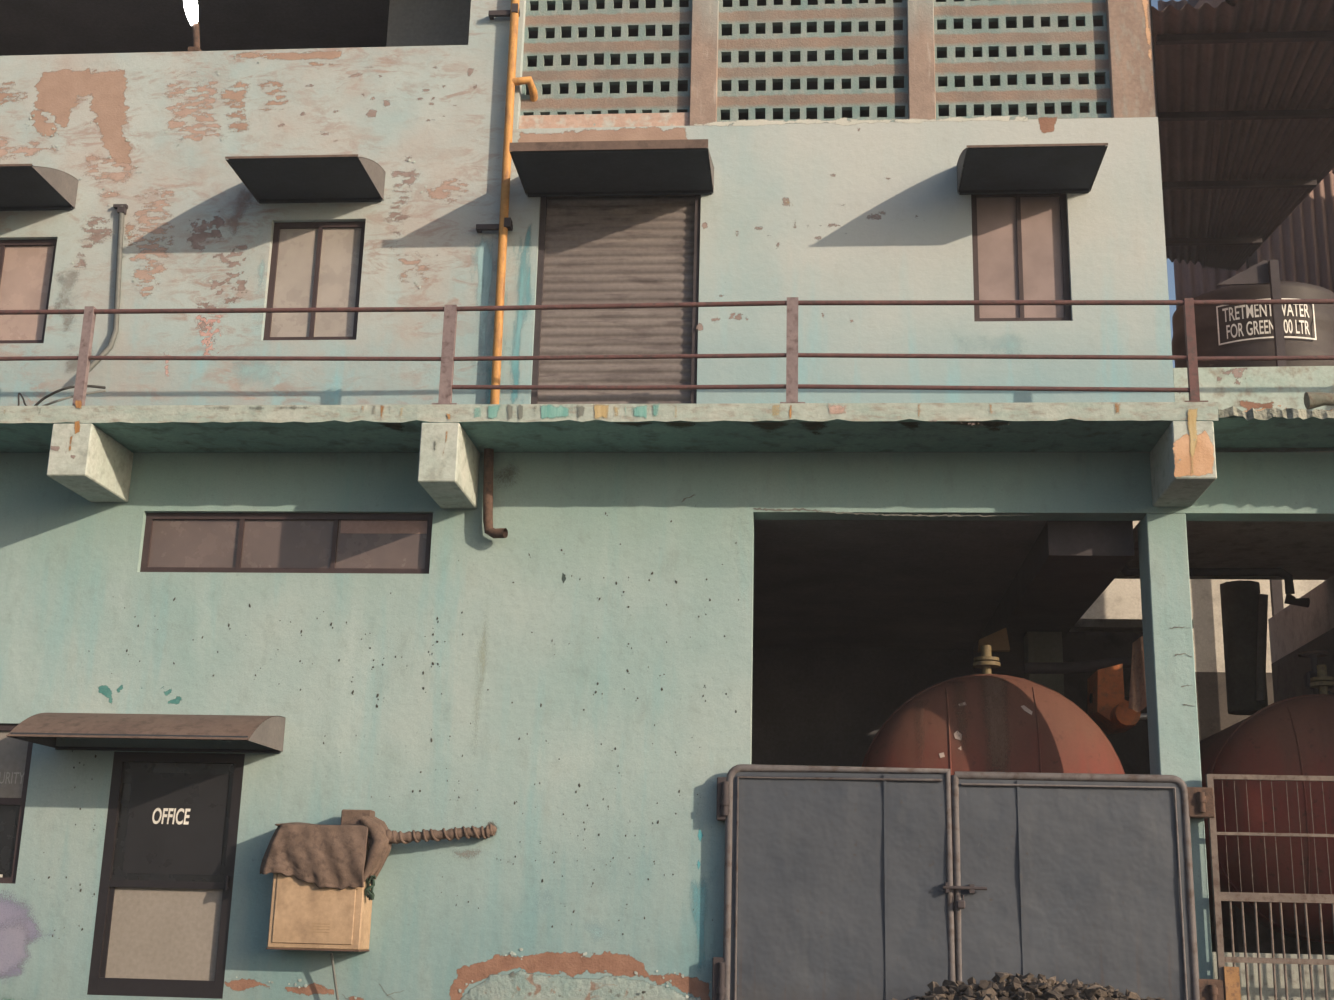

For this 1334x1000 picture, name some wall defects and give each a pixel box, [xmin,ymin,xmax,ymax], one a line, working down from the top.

peeling [235,50,341,66]
peeling [164,71,289,146]
peeling [518,116,1057,142]
peeling [0,68,248,356]
flaking render [696,313,748,331]
flaking render [1173,430,1215,477]
peeling [449,872,715,1000]
peeling [224,976,364,1000]